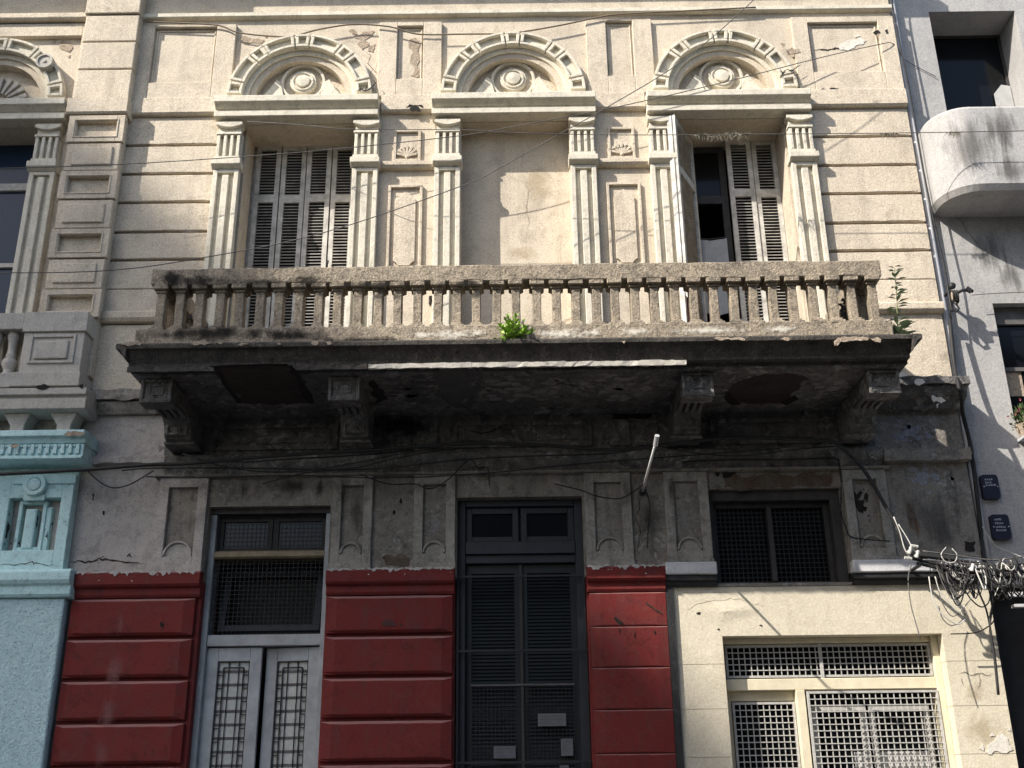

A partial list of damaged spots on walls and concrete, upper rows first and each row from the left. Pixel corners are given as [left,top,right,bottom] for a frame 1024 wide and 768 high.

peeling [349,29,375,52]
peeling [839,29,889,51]
peeling [408,38,421,78]
leakage [164,271,226,286]
spalling [834,336,881,346]
spalling [724,373,809,405]
crack [1,553,141,566]
peeling [326,553,454,575]
peeling [76,570,196,581]
peeling [979,726,1013,755]